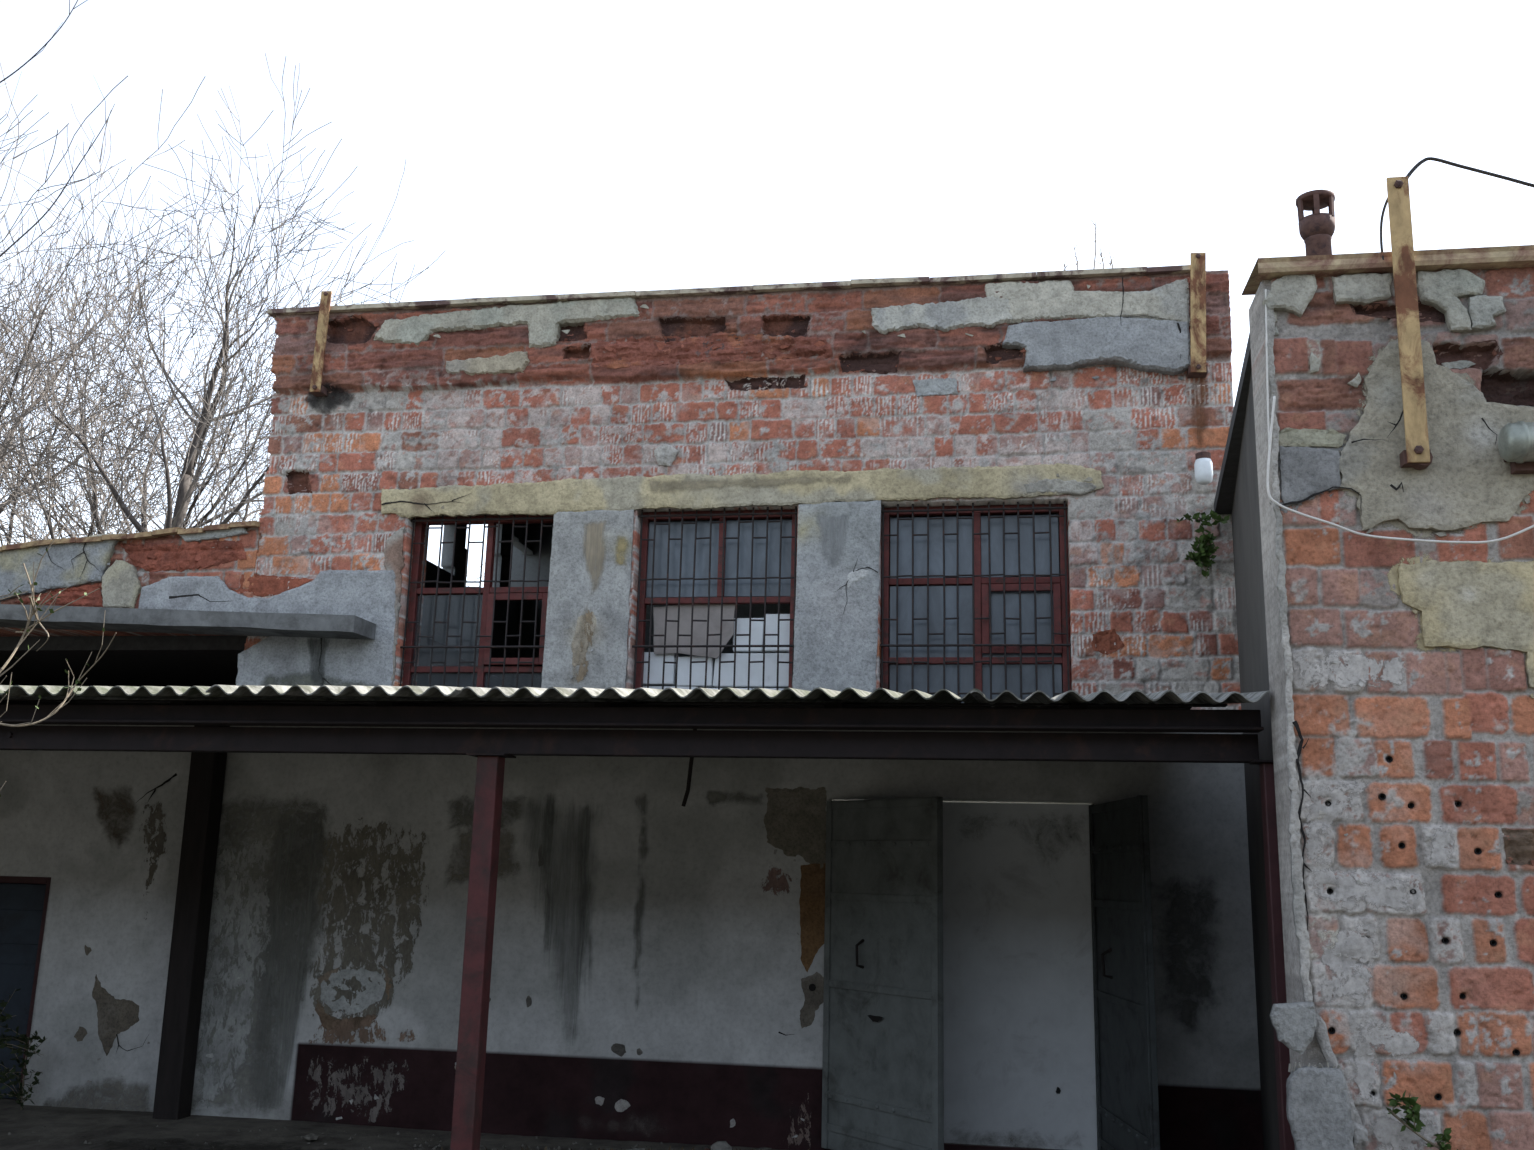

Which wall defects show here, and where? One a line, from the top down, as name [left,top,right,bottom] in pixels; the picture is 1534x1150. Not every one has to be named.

spalling [559,304,906,391]
spalling [965,333,1026,364]
leakage [96,790,136,844]
leakage [448,799,474,882]
peeling [762,787,827,868]
crack [1292,721,1311,931]
leakage [498,798,591,997]
peeling [74,974,150,1083]
peeling [195,839,273,1107]
peeling [307,818,429,1123]
peeling [800,972,824,1028]
peeling [1270,1002,1368,1145]